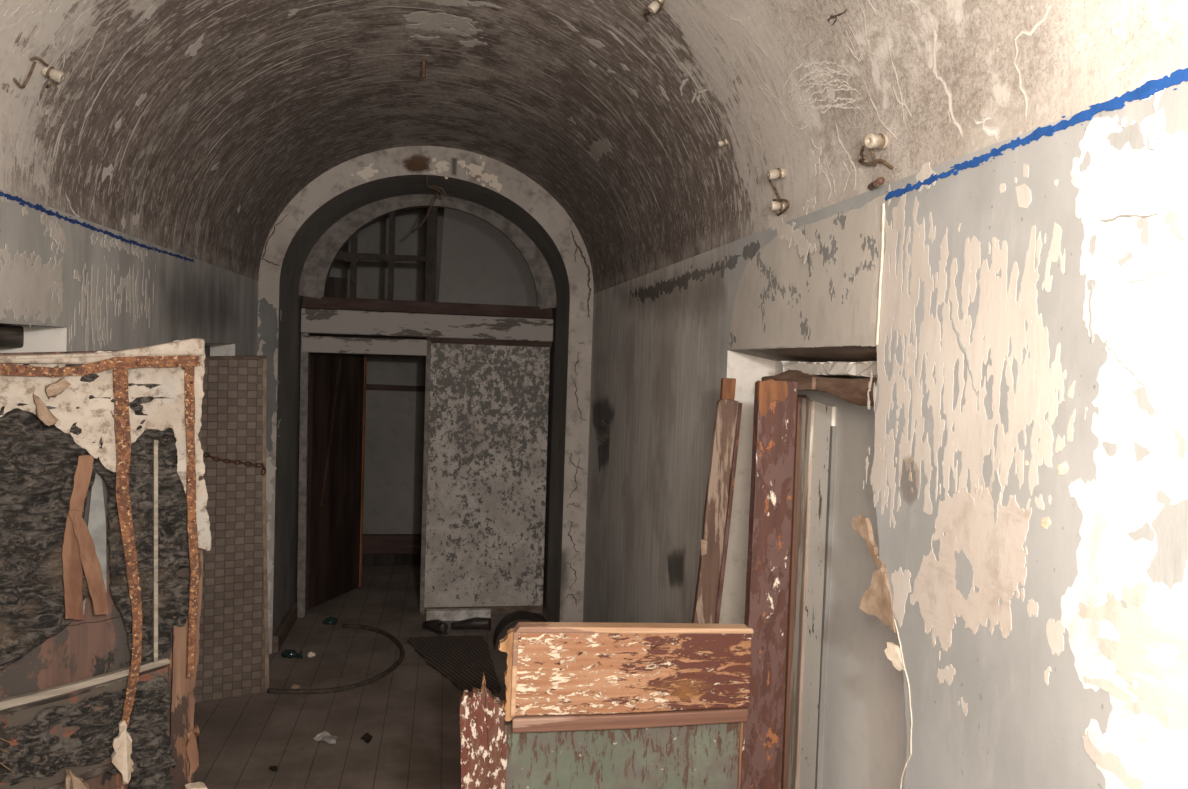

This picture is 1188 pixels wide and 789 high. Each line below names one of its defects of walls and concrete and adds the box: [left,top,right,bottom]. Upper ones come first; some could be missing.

peeling [185,37,203,56]
peeling [404,0,502,47]
peeling [563,20,624,48]
peeling [0,0,92,170]
peeling [567,117,612,162]
peeling [102,164,113,182]
peeling [351,163,387,181]
peeling [430,156,502,192]
peeling [764,195,816,264]
peeling [0,190,156,351]
peeling [852,74,1188,789]